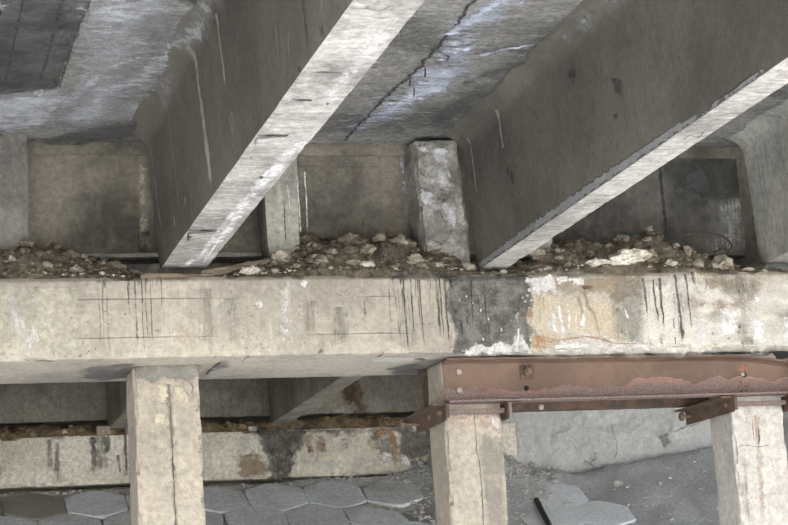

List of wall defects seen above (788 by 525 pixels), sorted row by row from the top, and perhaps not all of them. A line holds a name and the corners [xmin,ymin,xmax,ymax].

crack [344,0,477,140]
leakage [0,0,225,227]
leakage [127,277,162,347]
leakage [389,272,788,356]
spalling [521,274,660,353]
leakage [90,435,110,469]
leakage [117,433,127,475]
leakage [238,424,357,482]
rust [369,429,398,461]
leakage [356,426,431,467]